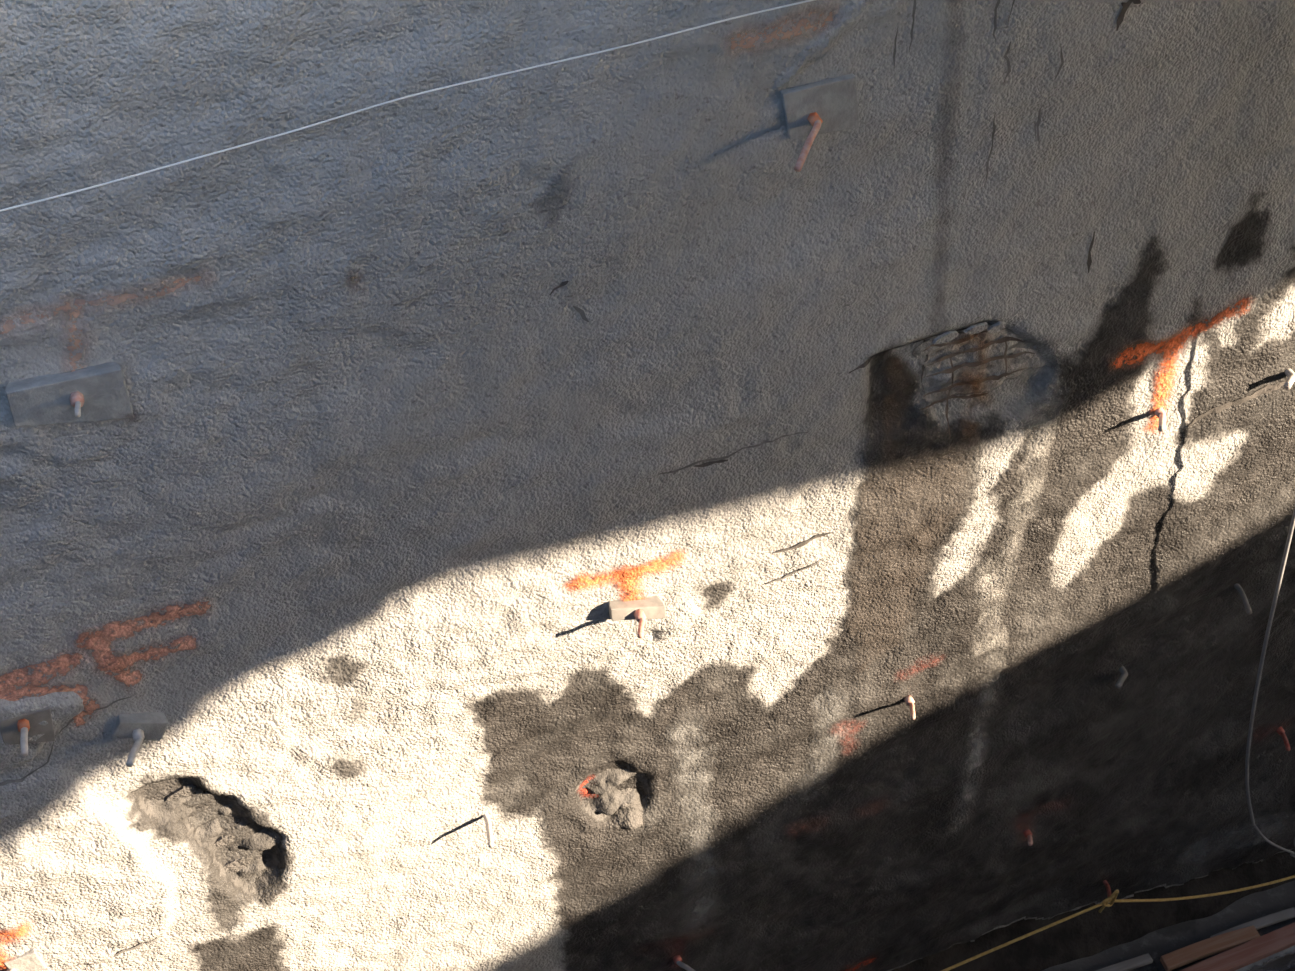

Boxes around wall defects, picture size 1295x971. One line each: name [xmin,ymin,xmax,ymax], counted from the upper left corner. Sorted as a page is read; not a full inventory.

water stain [1214,194,1270,273]
spalling [912,321,1051,434]
water stain [471,237,1295,971]
spalling [127,777,282,896]
water stain [130,775,293,971]
spalling [575,760,651,822]